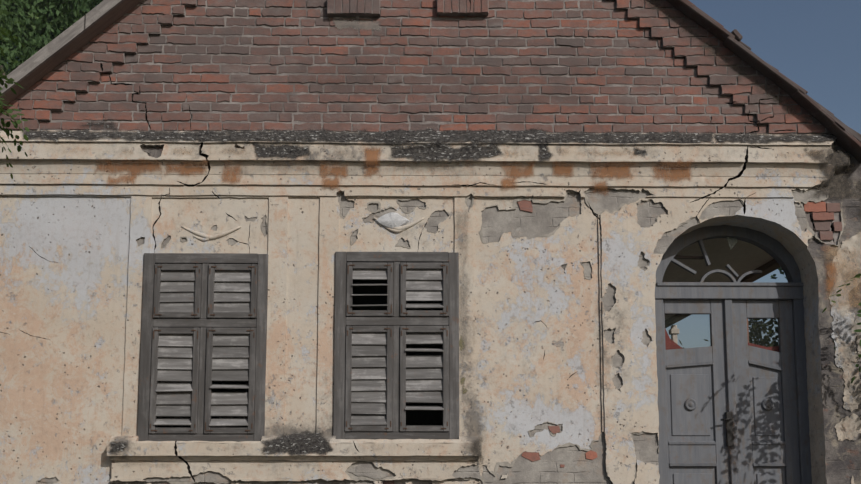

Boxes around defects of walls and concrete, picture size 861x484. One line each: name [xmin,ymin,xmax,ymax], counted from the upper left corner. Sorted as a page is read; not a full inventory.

crack [100,63,152,131]
crack [152,104,250,253]
crack [689,98,795,217]
flaking render [465,187,668,244]
flaking render [638,199,744,271]
flaking render [601,283,616,312]
flaking render [604,328,625,392]
flaking render [641,329,652,347]
flaking render [791,141,861,484]
crack [174,441,195,482]
flaking render [110,421,613,484]
flaking render [631,431,660,484]